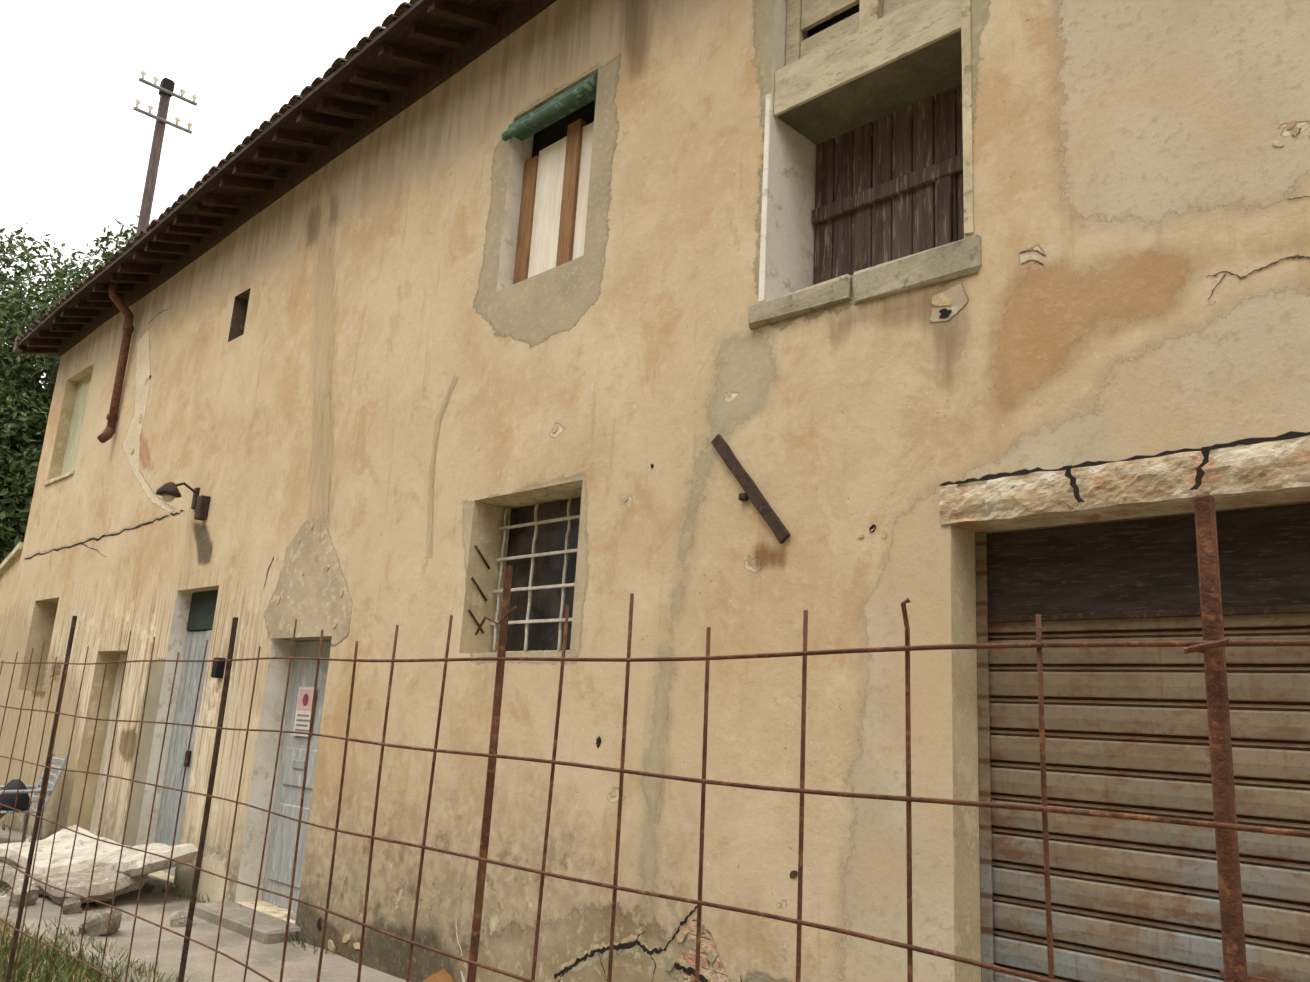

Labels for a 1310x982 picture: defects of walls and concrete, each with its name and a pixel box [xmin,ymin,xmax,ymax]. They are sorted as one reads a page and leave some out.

peeling [1049,0,1310,228]
peeling [992,245,1189,410]
crack [1206,255,1310,299]
crack [24,510,184,559]
crack [427,376,458,557]
crack [940,431,1310,503]
peeling [423,331,776,982]
peeling [835,283,1310,982]
crack [554,906,742,982]